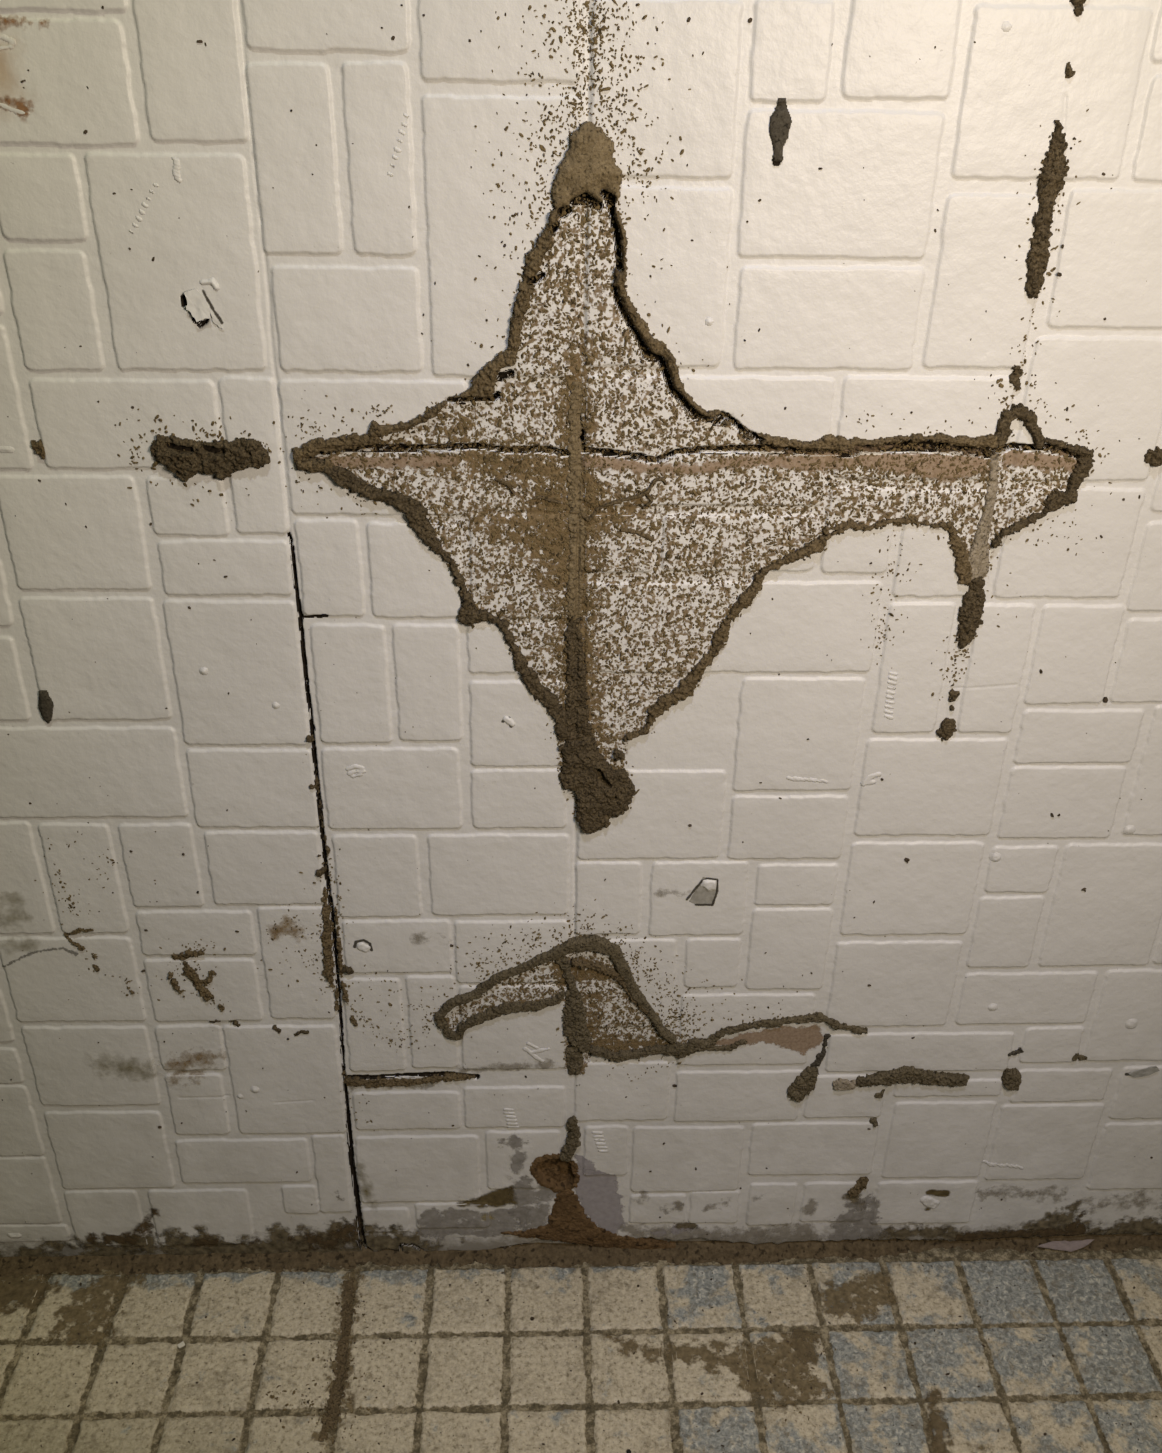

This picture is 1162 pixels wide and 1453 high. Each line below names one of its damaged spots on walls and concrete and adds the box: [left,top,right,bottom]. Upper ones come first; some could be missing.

rust [0,98,30,116]
peeling [180,277,223,329]
crack [316,415,1075,464]
crack [287,532,551,1251]
peeling [686,877,718,906]